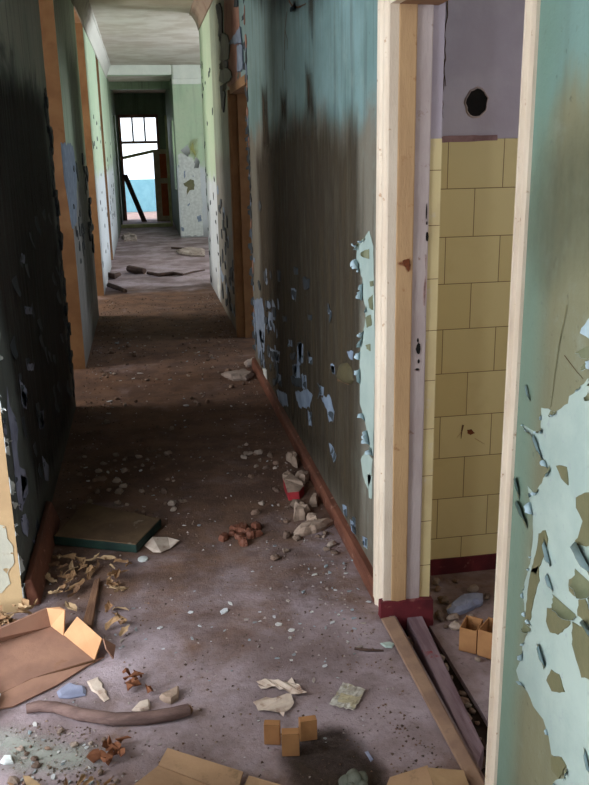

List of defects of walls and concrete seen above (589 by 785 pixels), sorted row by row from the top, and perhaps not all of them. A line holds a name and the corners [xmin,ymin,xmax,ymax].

peeling [0,337,49,598]
peeling [29,88,115,412]
spalling [178,145,236,318]
peeling [200,0,334,426]
peeling [342,504,368,549]
peeling [347,231,375,499]
crack [441,1,449,115]
hole [464,86,489,118]
peeling [514,319,589,785]